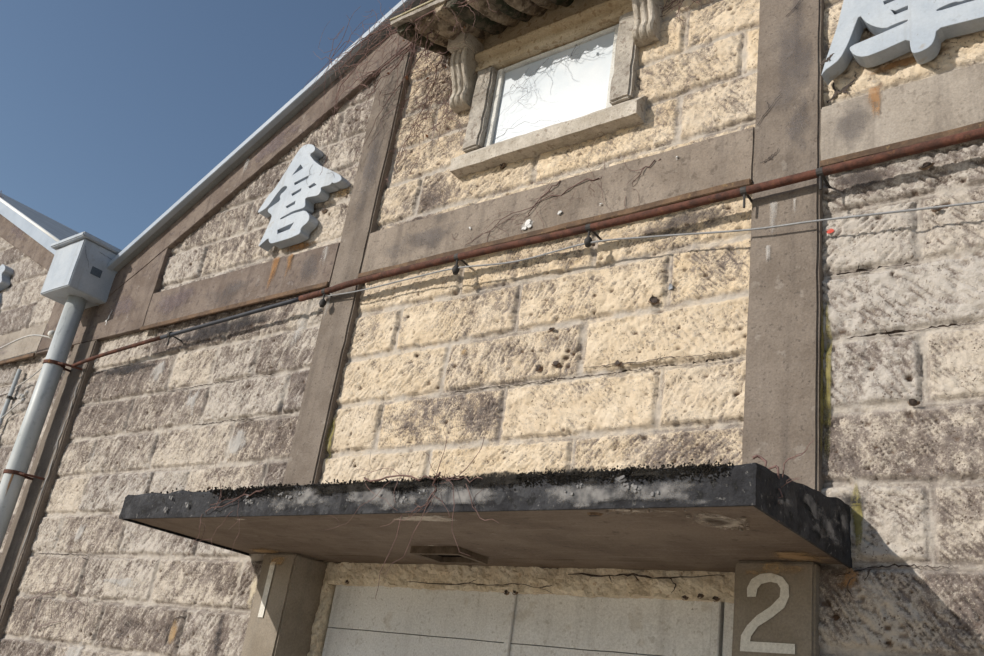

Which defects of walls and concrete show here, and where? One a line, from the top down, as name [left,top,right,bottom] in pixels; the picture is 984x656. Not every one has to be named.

corrosion [269,242,310,281]
water stain [315,468,604,495]
crack [409,573,725,594]